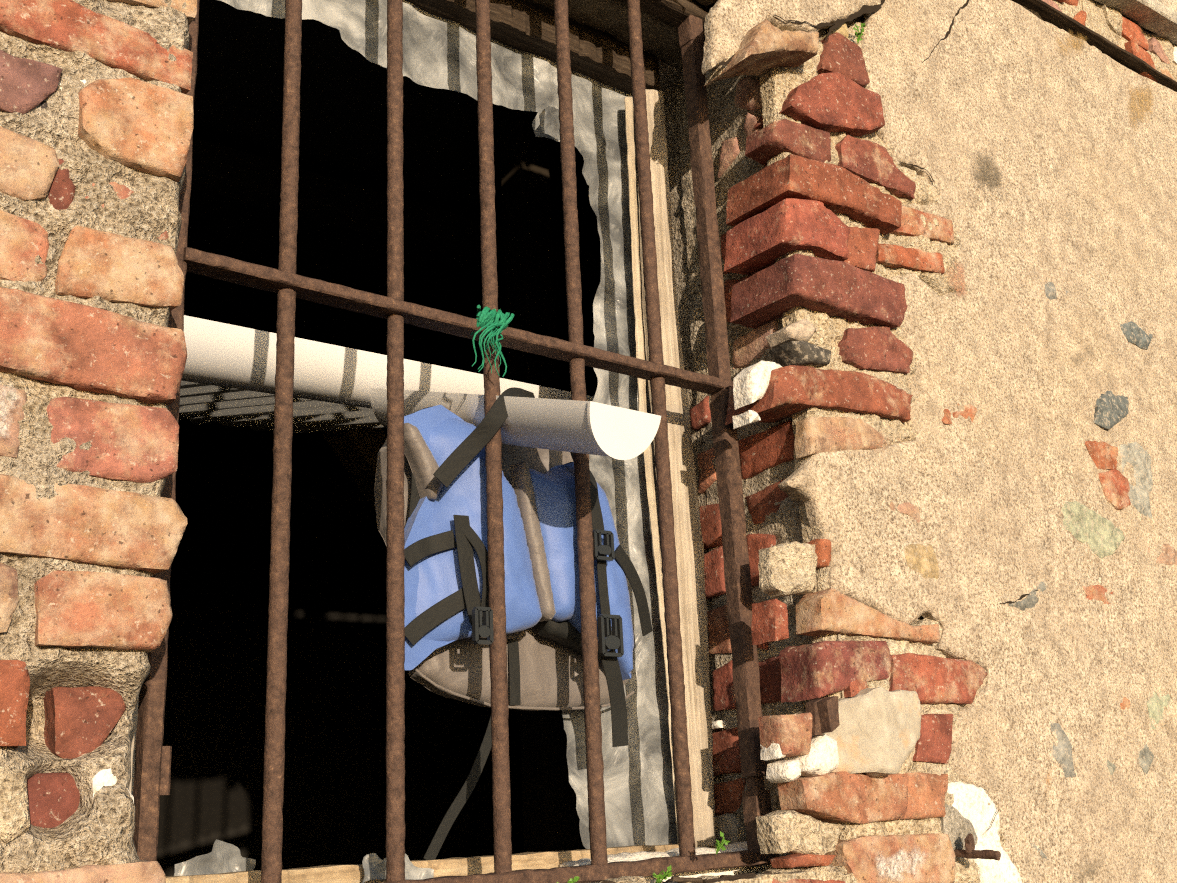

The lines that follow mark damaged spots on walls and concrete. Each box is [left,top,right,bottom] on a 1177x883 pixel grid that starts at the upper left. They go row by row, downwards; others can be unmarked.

crack [923,0,970,62]
spalling [1045,282,1068,300]
flaking render [0,0,197,883]
flaking render [689,396,711,431]
flaking render [697,19,1022,883]
spalling [1008,581,1047,611]